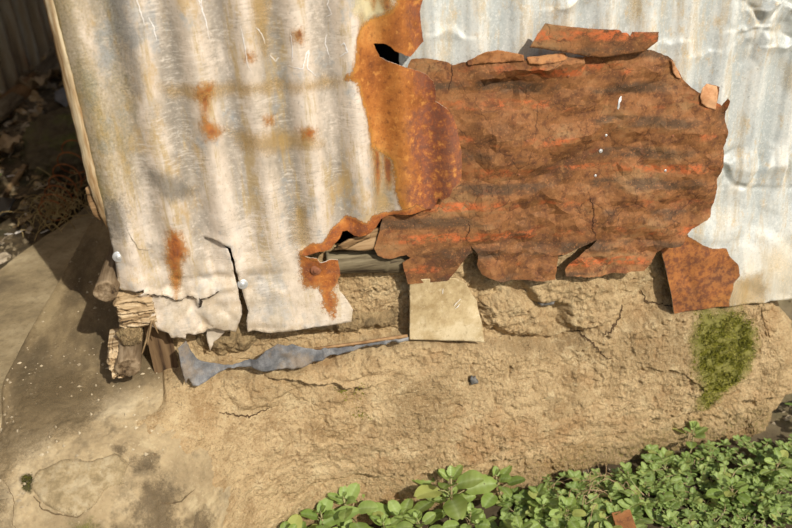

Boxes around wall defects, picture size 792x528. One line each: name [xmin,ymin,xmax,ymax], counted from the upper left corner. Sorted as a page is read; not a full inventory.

corrosion [298,0,740,318]
corrosion [165,230,188,290]
crack [577,305,623,359]